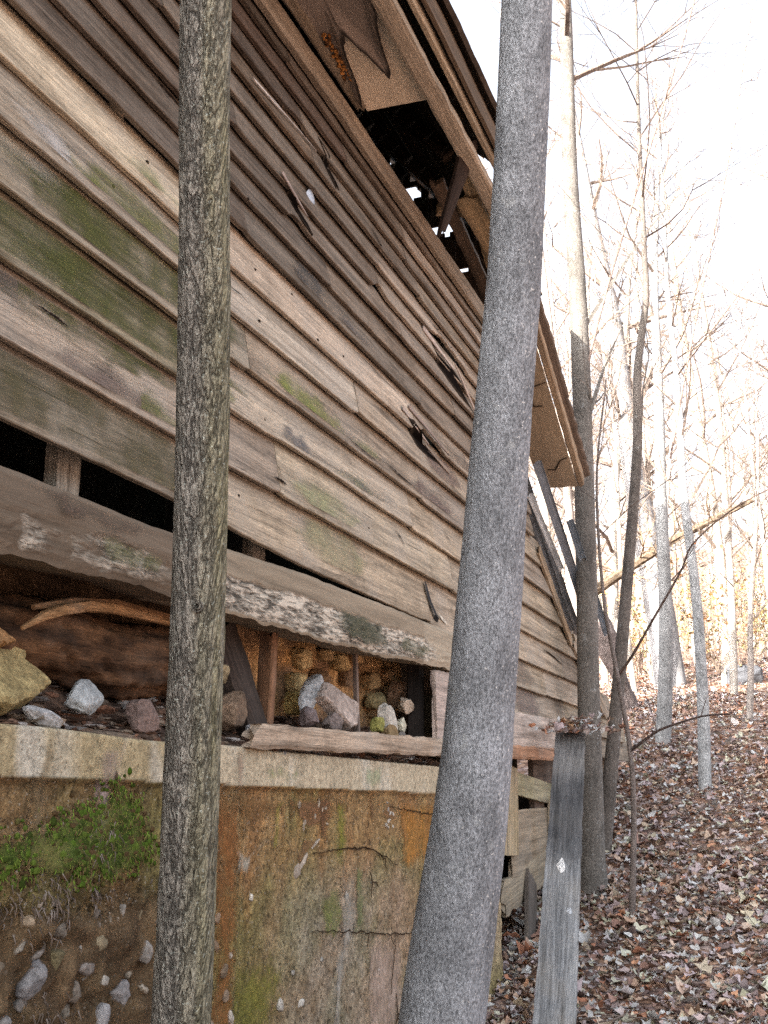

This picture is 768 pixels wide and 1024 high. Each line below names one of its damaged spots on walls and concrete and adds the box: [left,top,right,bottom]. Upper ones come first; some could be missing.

crack [312,847,398,898]